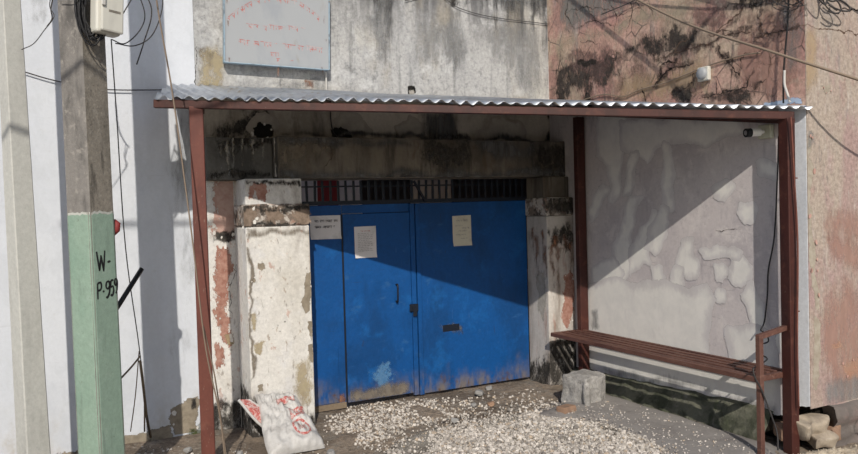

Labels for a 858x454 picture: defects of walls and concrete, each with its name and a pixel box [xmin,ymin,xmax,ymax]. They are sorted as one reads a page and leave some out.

leakage [376,0,392,34]
leakage [494,0,546,83]
crack [565,0,653,44]
leakage [556,5,697,107]
mould [722,86,750,104]
crack [619,5,858,107]
leakage [211,110,565,187]
peeling [247,248,267,392]
peeling [208,181,311,369]
peeling [300,270,313,363]
peeling [560,269,575,330]
spalling [125,396,200,444]